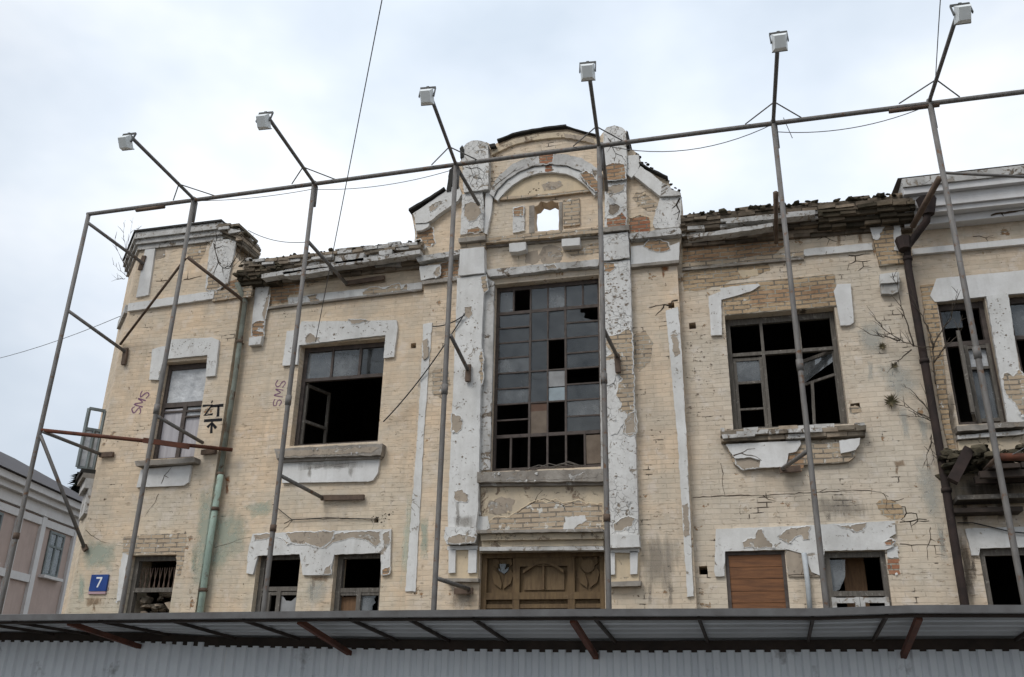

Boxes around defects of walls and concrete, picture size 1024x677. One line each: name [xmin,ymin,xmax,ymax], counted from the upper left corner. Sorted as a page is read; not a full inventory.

spalling [462,194,486,234]
spalling [584,169,635,232]
crack [818,237,870,271]
flaking render [451,399,467,442]
flaking render [601,409,638,532]
peeling [734,458,760,471]
spalling [787,452,804,471]
crack [517,490,582,513]
crack [693,448,945,558]
flaking render [254,508,397,575]
flaking render [742,525,811,549]
flaking render [836,522,867,533]